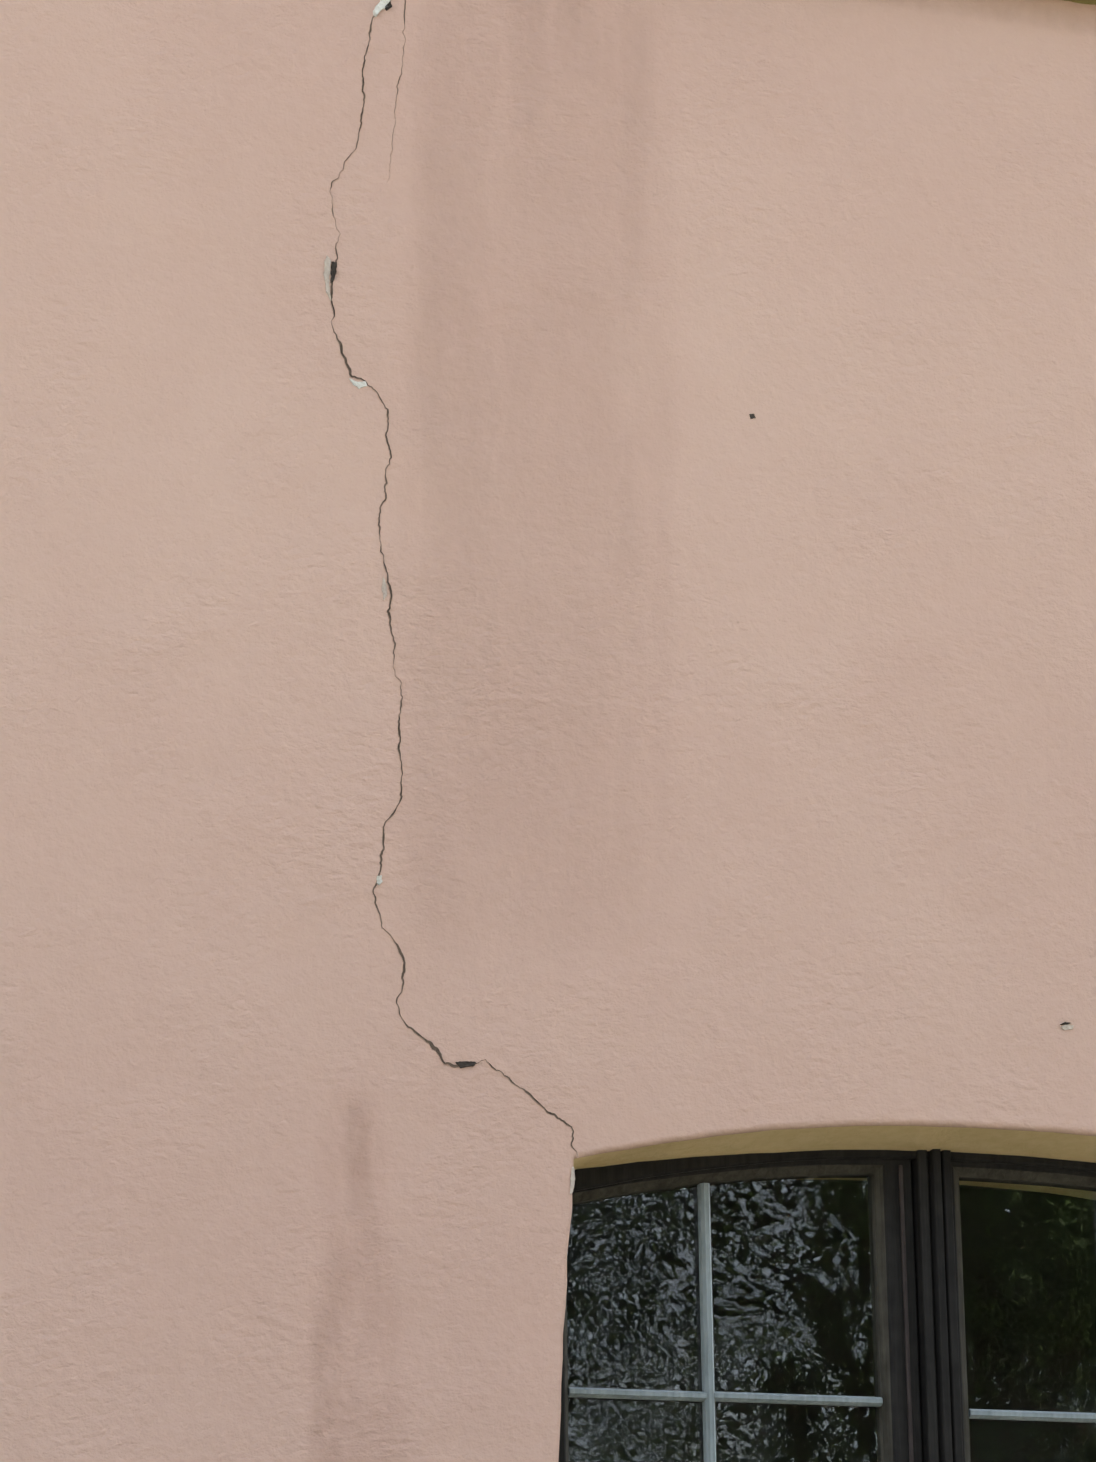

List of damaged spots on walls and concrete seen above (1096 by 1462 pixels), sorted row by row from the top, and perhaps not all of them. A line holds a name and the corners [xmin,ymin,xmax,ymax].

crack [323,0,578,1157]